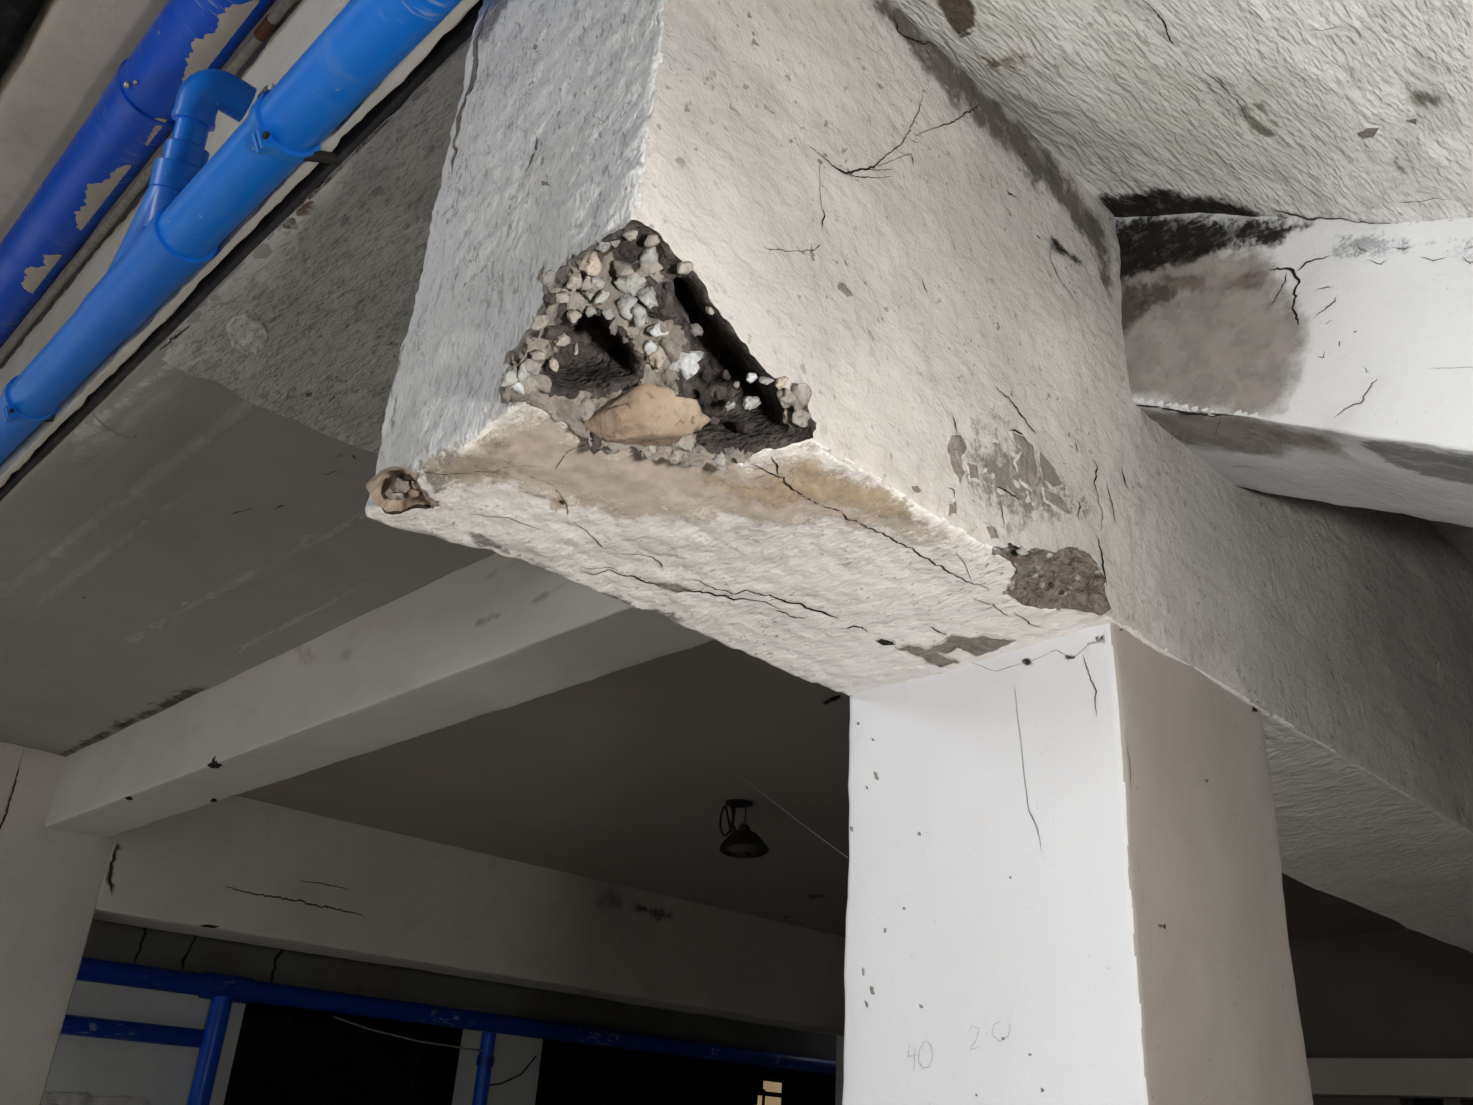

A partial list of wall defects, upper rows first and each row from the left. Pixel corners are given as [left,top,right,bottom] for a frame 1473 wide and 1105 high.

spalling [499,219,817,474]
spalling [366,466,438,512]
crack [415,445,867,632]
leakage [426,419,946,542]
peeling [909,483,923,497]
peeling [944,415,979,519]
spalling [983,429,1110,615]
peeling [875,627,1017,668]
crack [0,768,19,829]
crack [1014,686,1041,847]
crack [224,881,366,917]